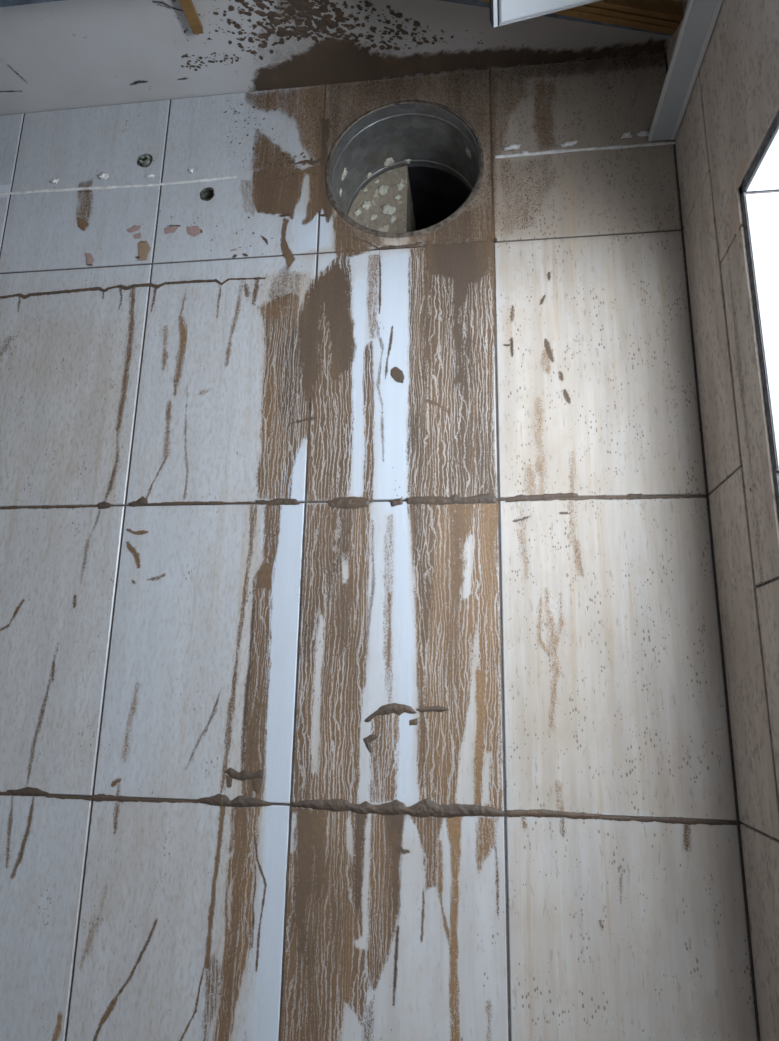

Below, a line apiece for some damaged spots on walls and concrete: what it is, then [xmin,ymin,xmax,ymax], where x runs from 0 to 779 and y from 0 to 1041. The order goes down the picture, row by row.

leakage [253,0,403,69]
leakage [103,287,136,502]
leakage [224,41,667,703]
leakage [201,806,257,1041]
leakage [220,504,281,793]
leakage [288,804,331,973]
leakage [352,803,368,924]
leakage [361,995,375,1041]
leakage [371,716,385,796]
leakage [382,814,406,1006]
leakage [408,500,499,788]
leakage [437,669,499,1041]